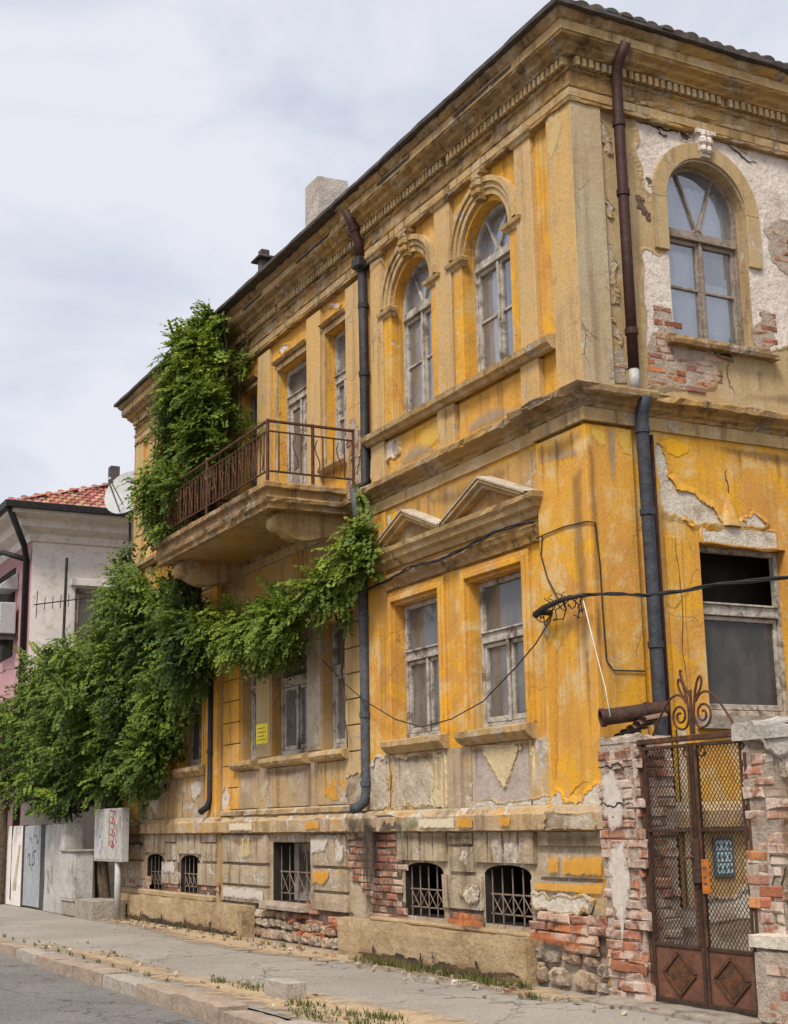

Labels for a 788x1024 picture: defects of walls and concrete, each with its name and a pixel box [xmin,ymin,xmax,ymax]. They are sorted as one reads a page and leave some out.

flaking render [629,119,694,221]
flaking render [638,141,788,395]
peeling [653,437,726,532]
peeling [739,511,770,532]
flaking render [127,861,181,892]
flaking render [310,752,435,919]
flaking render [471,744,623,831]
flaking render [529,841,649,993]